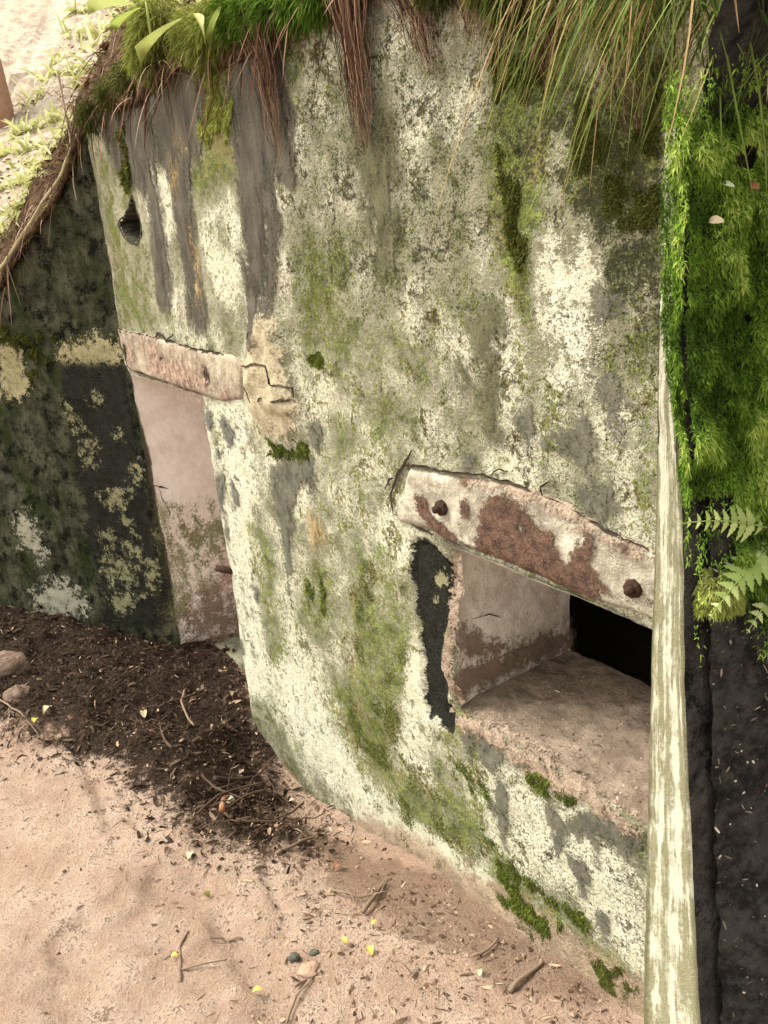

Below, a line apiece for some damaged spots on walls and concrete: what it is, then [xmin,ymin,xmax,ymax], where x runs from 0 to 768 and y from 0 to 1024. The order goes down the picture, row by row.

damp [103,71,208,338]
damp [222,32,295,355]
corrosion [413,477,609,603]